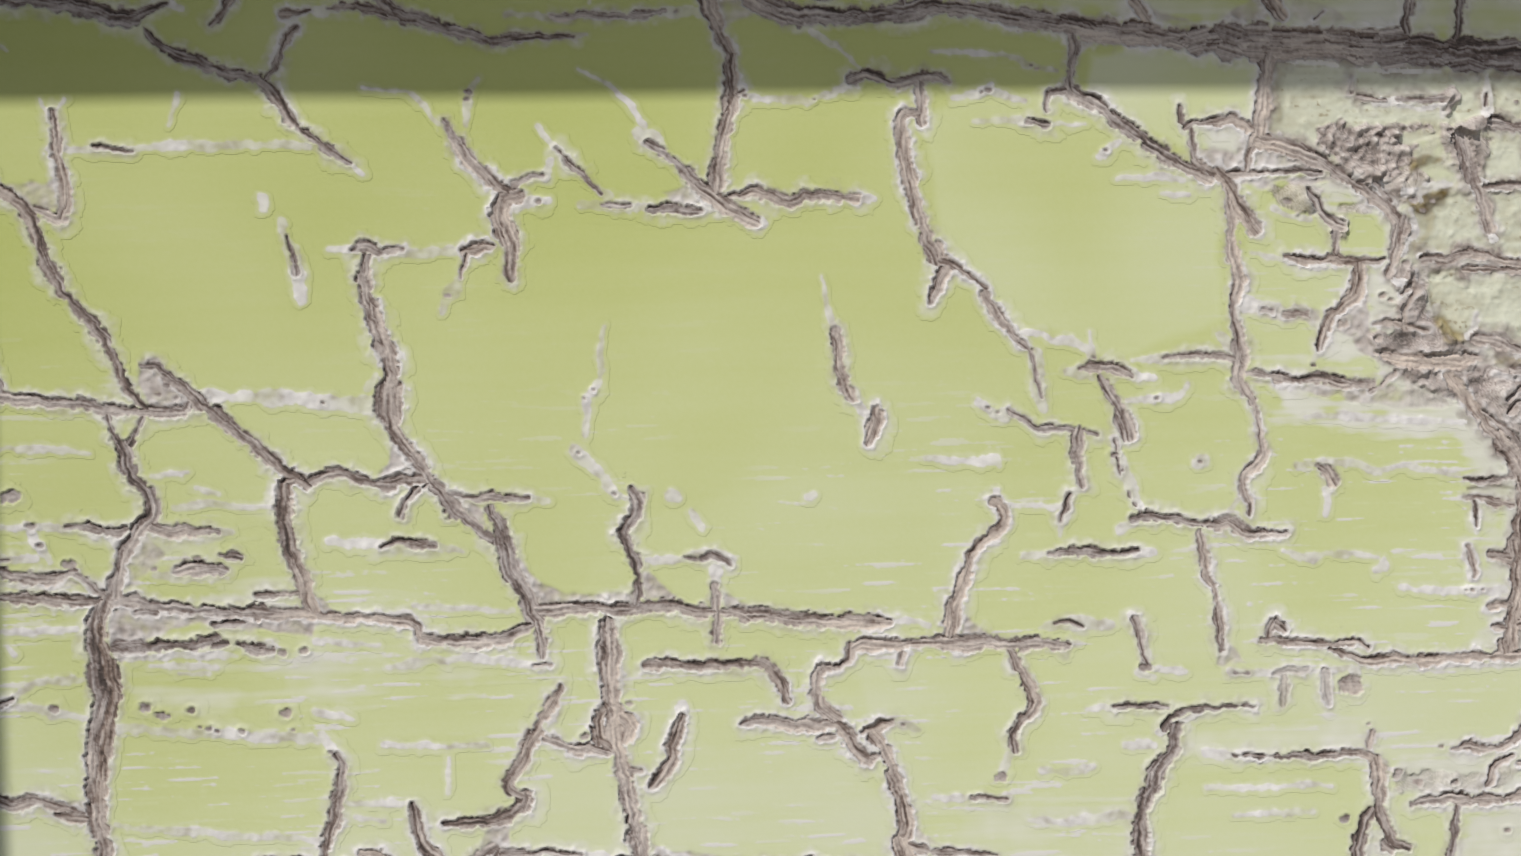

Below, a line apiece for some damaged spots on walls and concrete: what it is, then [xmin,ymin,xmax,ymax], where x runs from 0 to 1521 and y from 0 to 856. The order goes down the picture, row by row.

spalling [925,44,1263,204]
spalling [1239,68,1521,451]
crack [0,0,1087,856]
peeling [1020,323,1102,360]
crack [728,0,1521,721]
peeling [1125,375,1196,412]
spalling [1302,450,1349,522]
peeling [1367,552,1510,602]
spalling [1335,664,1371,707]
crack [1080,689,1521,856]
peeling [1391,749,1521,797]